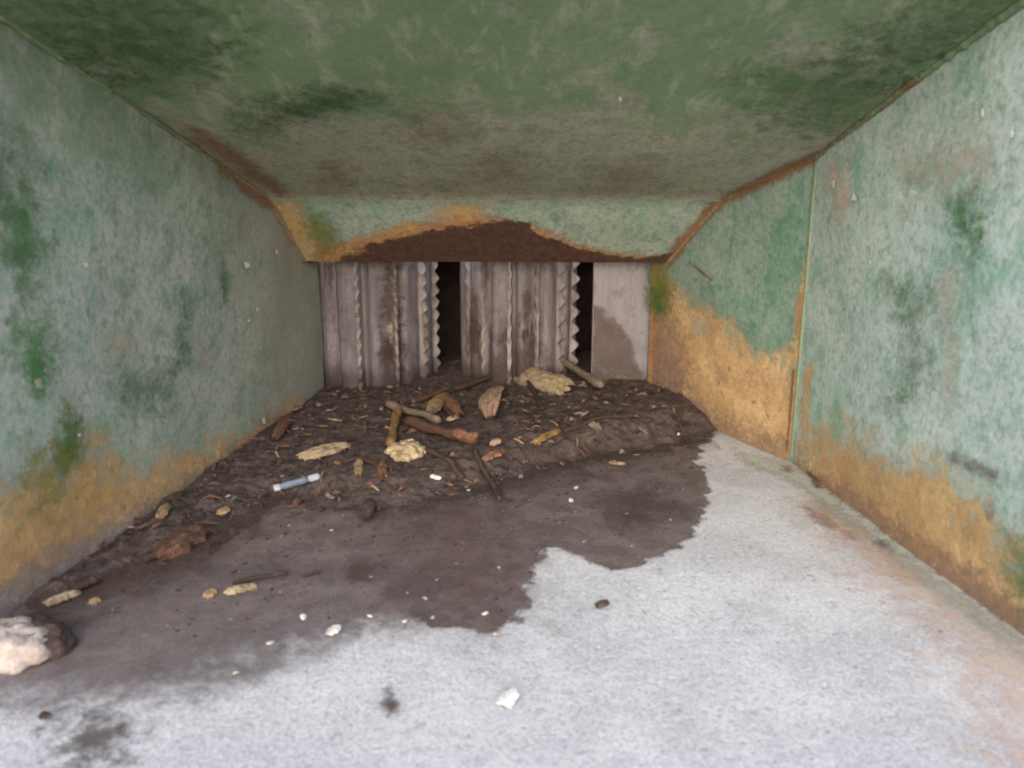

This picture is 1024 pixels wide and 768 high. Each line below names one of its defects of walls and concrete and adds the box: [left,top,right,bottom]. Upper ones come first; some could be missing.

rust [190,129,344,268]
leakage [12,319,56,398]
rust [647,153,1024,634]
rust [0,398,300,619]
leakage [0,433,720,707]